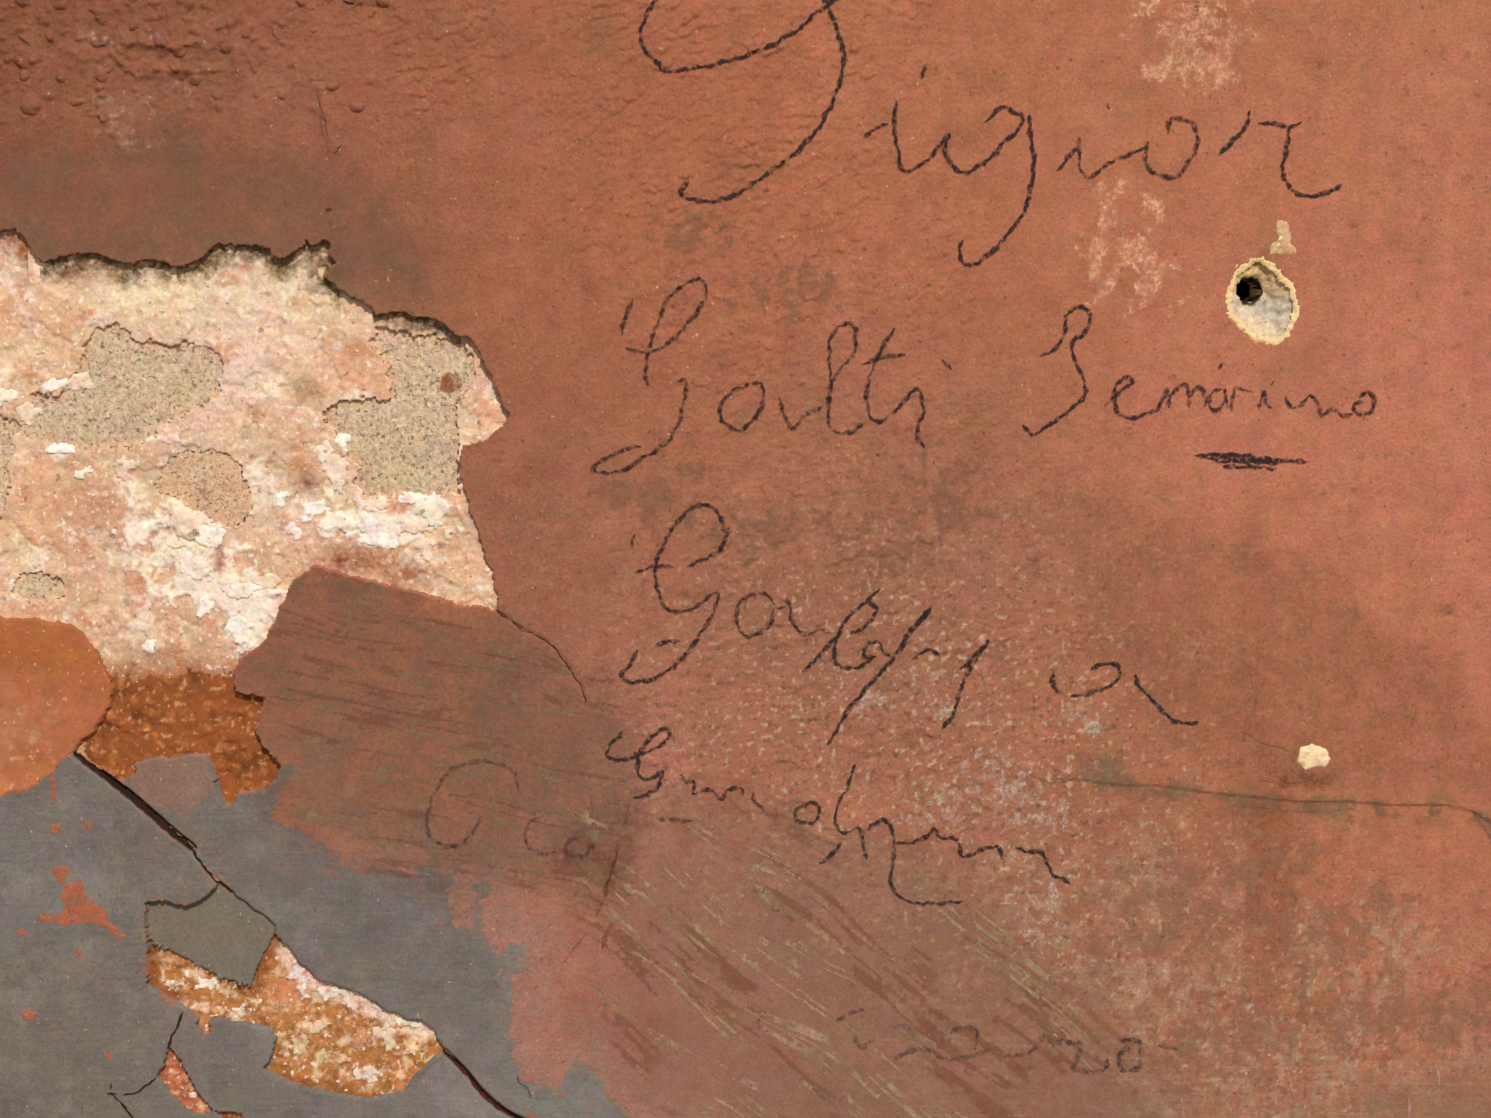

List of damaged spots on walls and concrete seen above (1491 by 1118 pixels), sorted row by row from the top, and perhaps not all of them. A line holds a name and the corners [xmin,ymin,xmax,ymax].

spalling [0,230,627,1118]
crack [73,752,233,892]
crack [564,794,628,961]
crack [1016,732,1491,840]
crack [107,1012,183,1118]
crack [443,1049,531,1118]